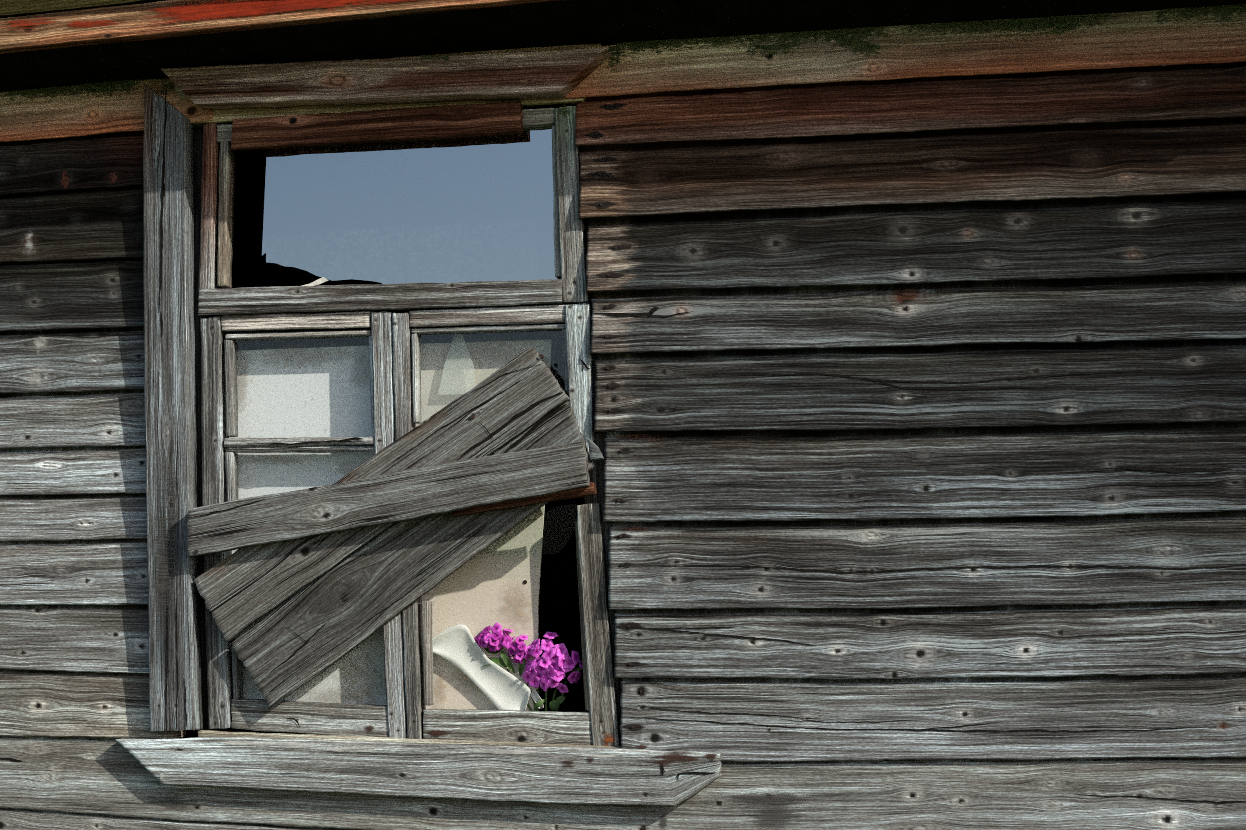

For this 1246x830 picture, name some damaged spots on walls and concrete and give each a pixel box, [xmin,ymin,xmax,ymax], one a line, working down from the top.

peeling [150,0,415,25]
peeling [2,18,119,28]
crack [1076,794,1246,804]